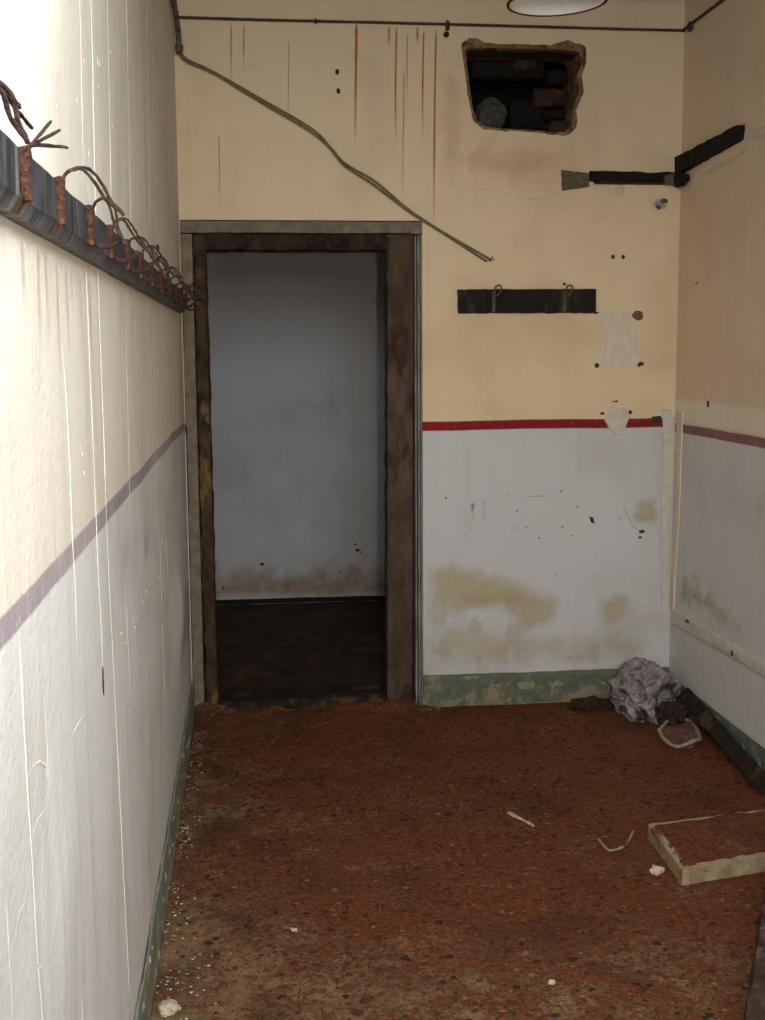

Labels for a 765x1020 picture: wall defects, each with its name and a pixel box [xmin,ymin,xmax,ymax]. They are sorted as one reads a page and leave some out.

rust [388,29,436,168]
spalling [461,38,586,136]